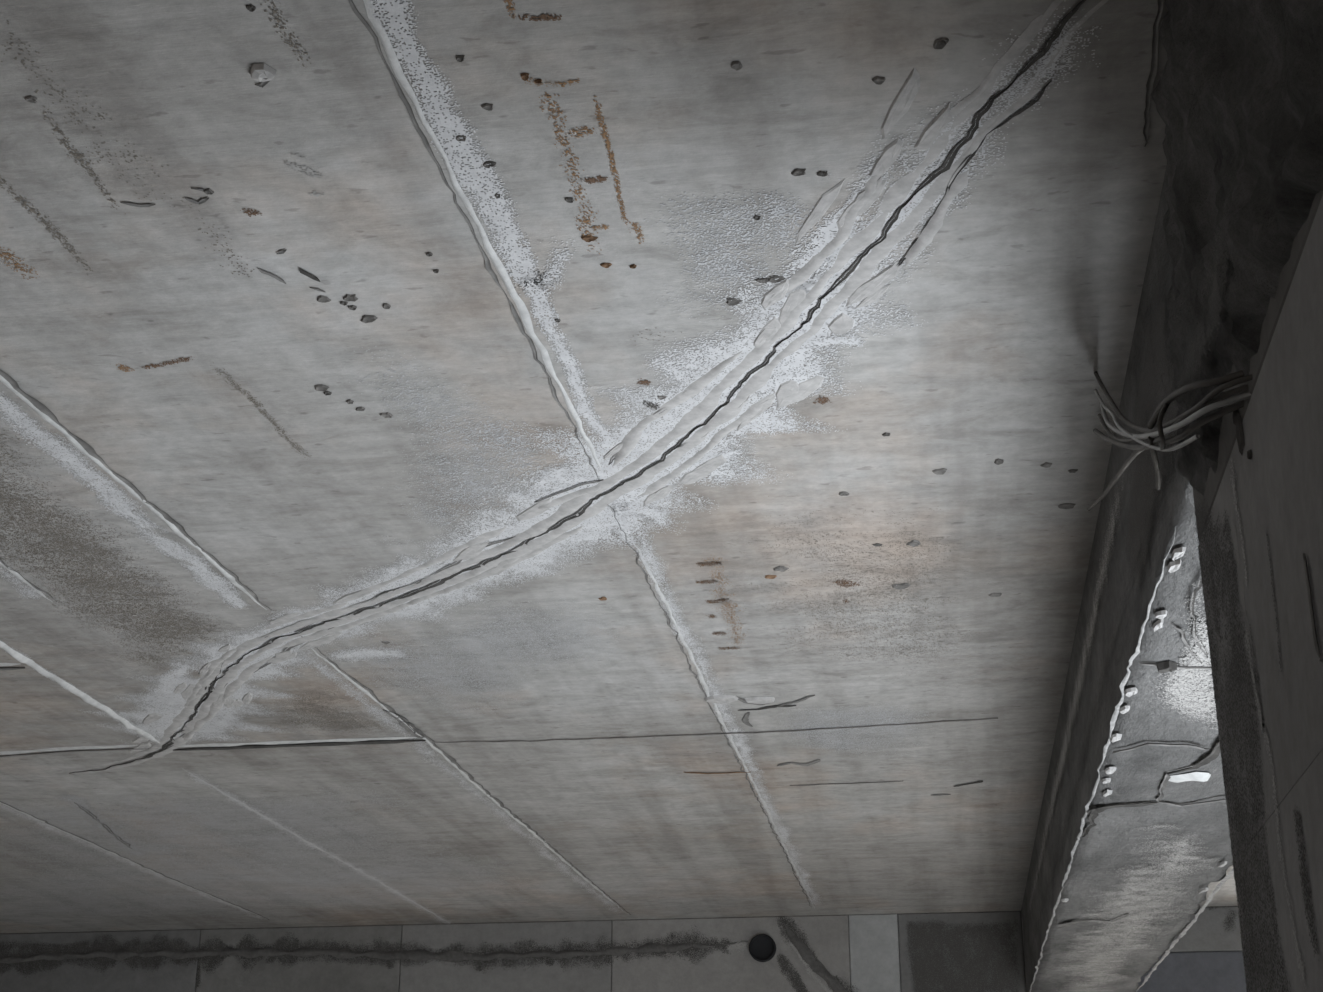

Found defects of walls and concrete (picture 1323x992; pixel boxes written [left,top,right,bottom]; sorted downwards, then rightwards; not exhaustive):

corrosion [504,0,562,21]
crack [1143,0,1163,147]
corrosion [526,78,645,254]
leakage [0,0,1101,924]
crack [56,0,1108,857]
crack [1139,577,1211,674]
spalling [1030,528,1186,992]
crack [1082,742,1226,837]